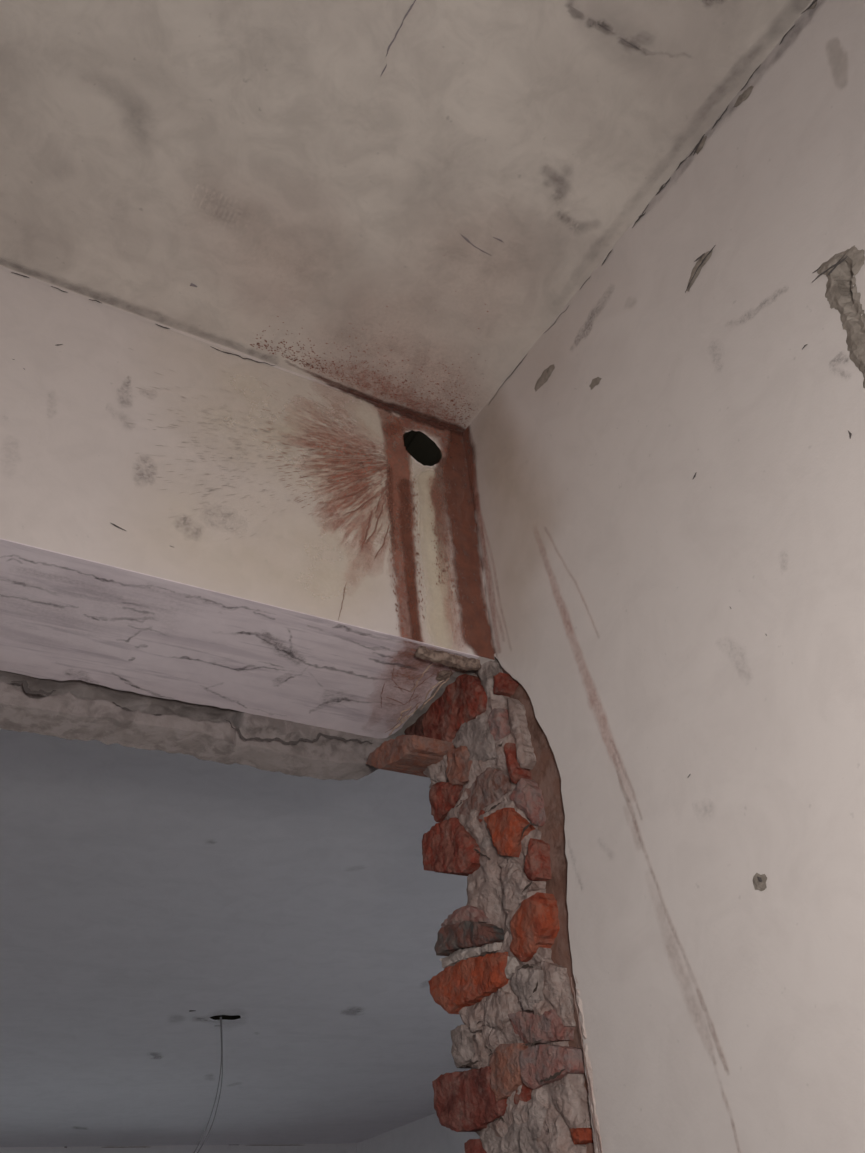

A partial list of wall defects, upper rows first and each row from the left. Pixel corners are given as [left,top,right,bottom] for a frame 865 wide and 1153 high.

corrosion [258,376,496,735]
flaking render [0,646,603,1153]